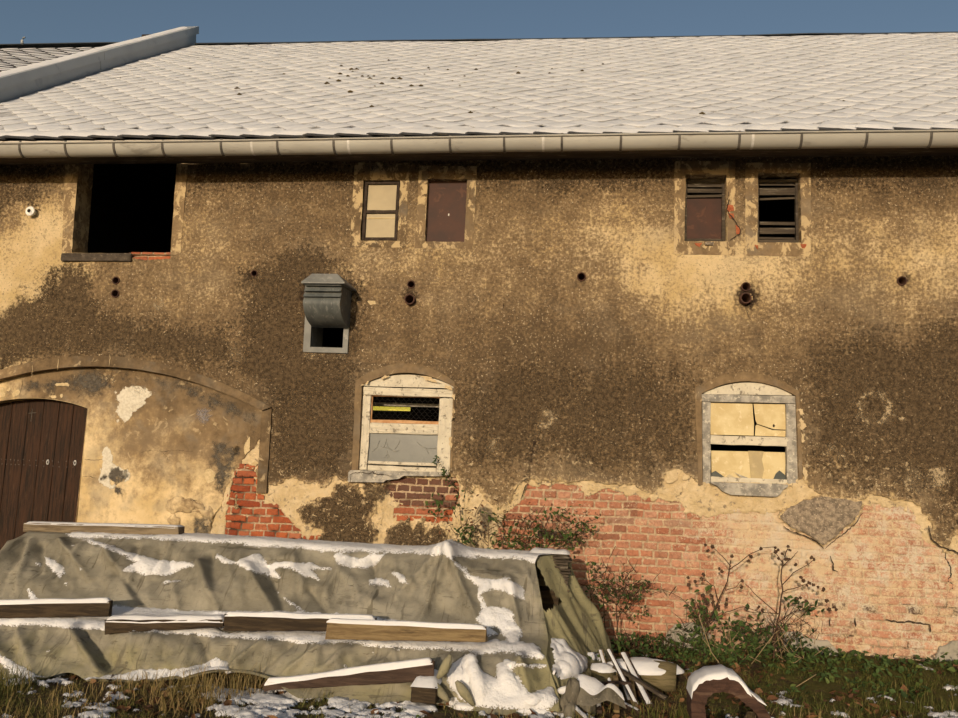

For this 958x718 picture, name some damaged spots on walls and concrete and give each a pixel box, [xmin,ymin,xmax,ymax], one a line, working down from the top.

peeling [98,447,130,494]
peeling [115,386,152,423]
water stain [0,238,447,546]
water stain [454,351,695,474]
flaking render [798,408,807,443]
water stain [805,318,958,507]
flaking render [165,437,958,661]
crack [928,526,958,554]